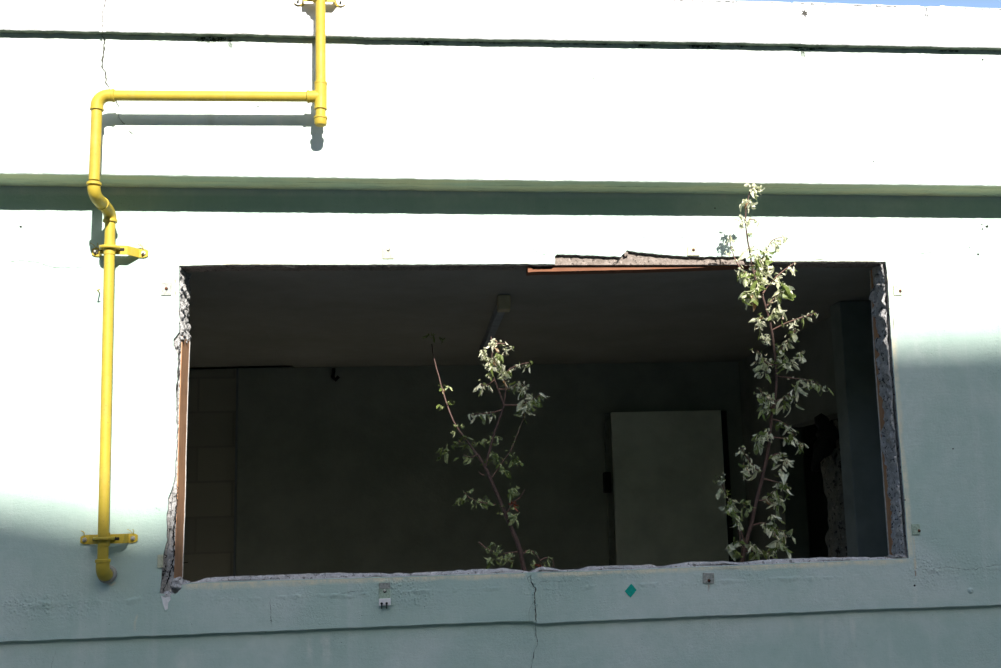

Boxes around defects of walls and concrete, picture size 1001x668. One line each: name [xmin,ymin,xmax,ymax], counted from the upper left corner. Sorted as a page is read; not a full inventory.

crack [100,0,142,151]
spalling [159,251,907,612]
crack [527,574,566,668]